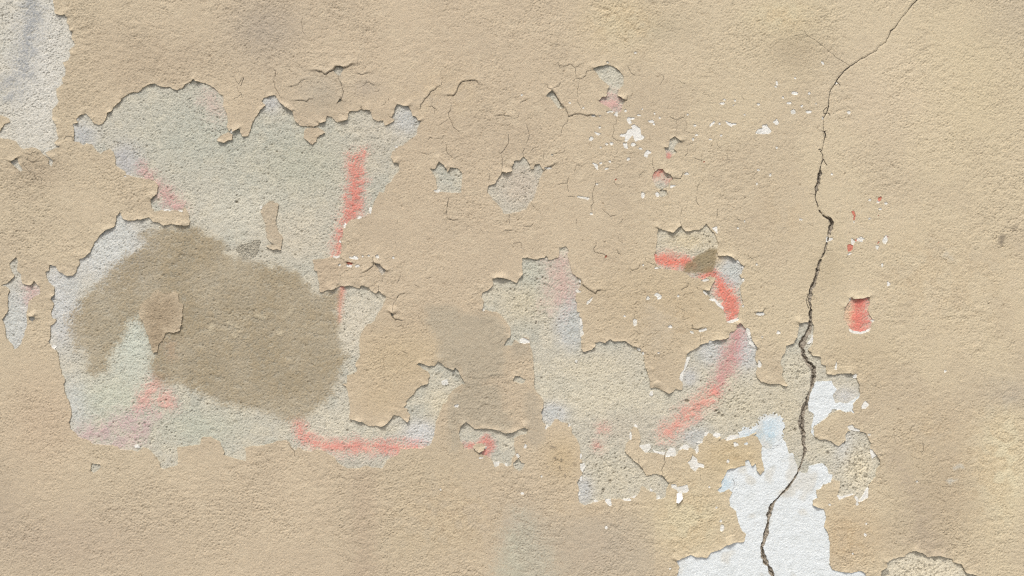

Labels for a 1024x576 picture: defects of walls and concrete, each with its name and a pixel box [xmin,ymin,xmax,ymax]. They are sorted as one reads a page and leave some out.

peeling [0,0,75,171]
peeling [2,257,35,349]
peeling [35,77,880,576]
crack [760,0,917,576]
peeling [881,551,976,576]